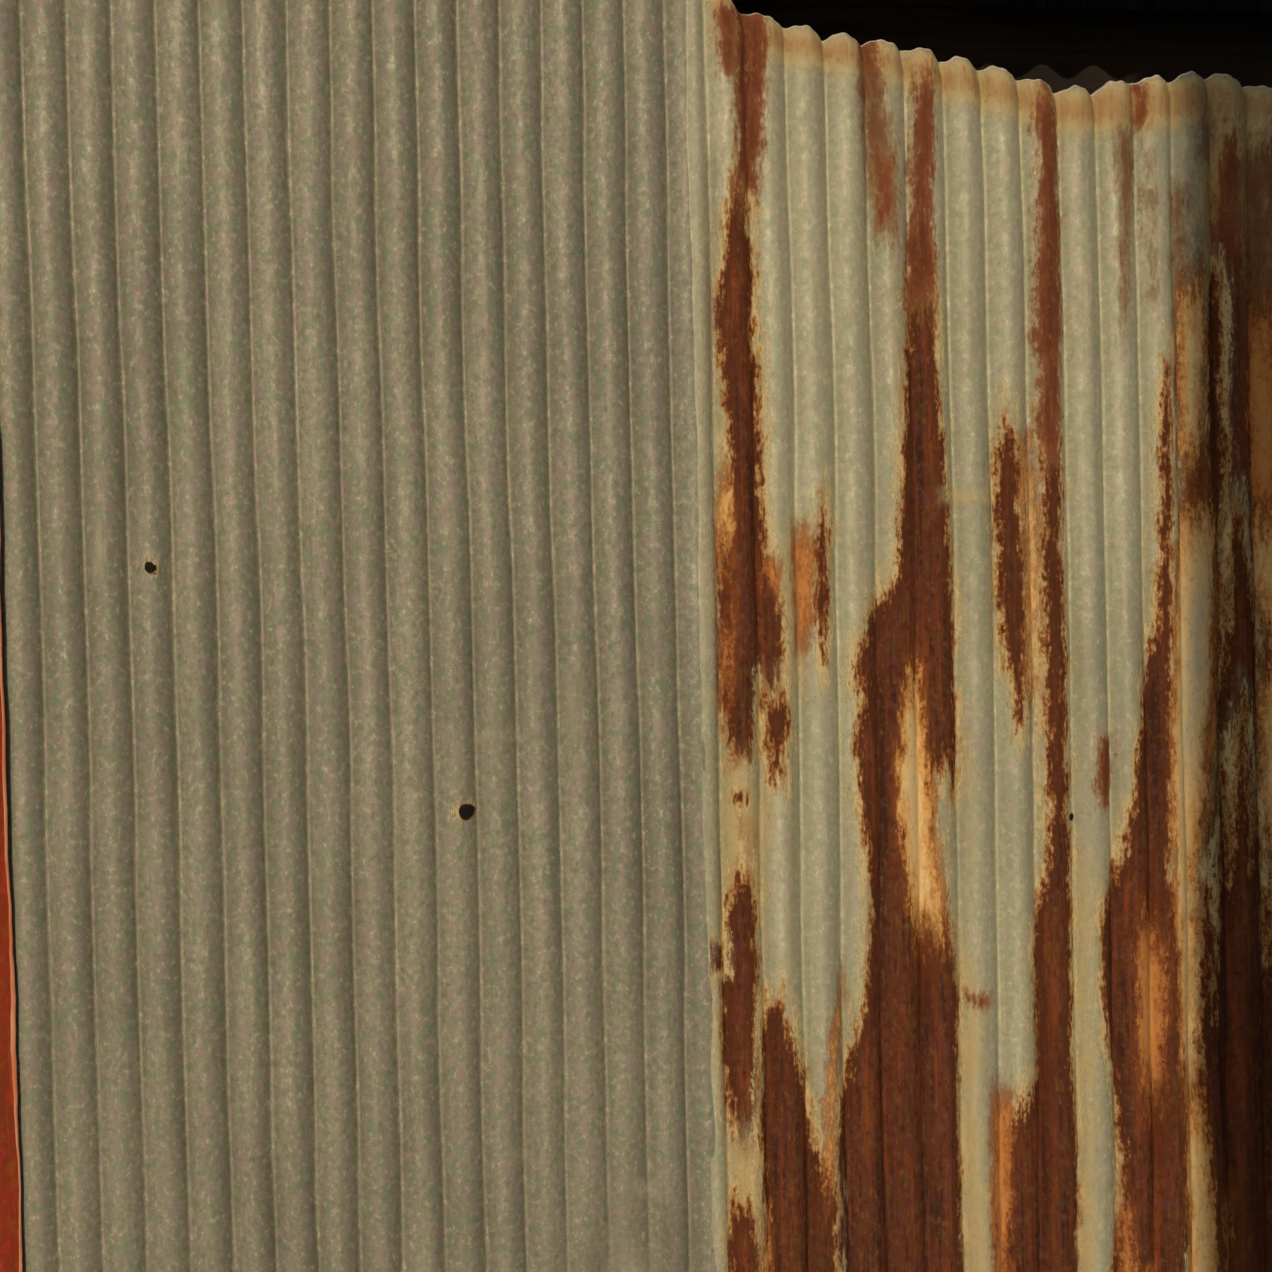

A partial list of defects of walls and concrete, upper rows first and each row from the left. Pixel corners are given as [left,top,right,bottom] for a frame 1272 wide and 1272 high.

rust [706,0,1272,1272]